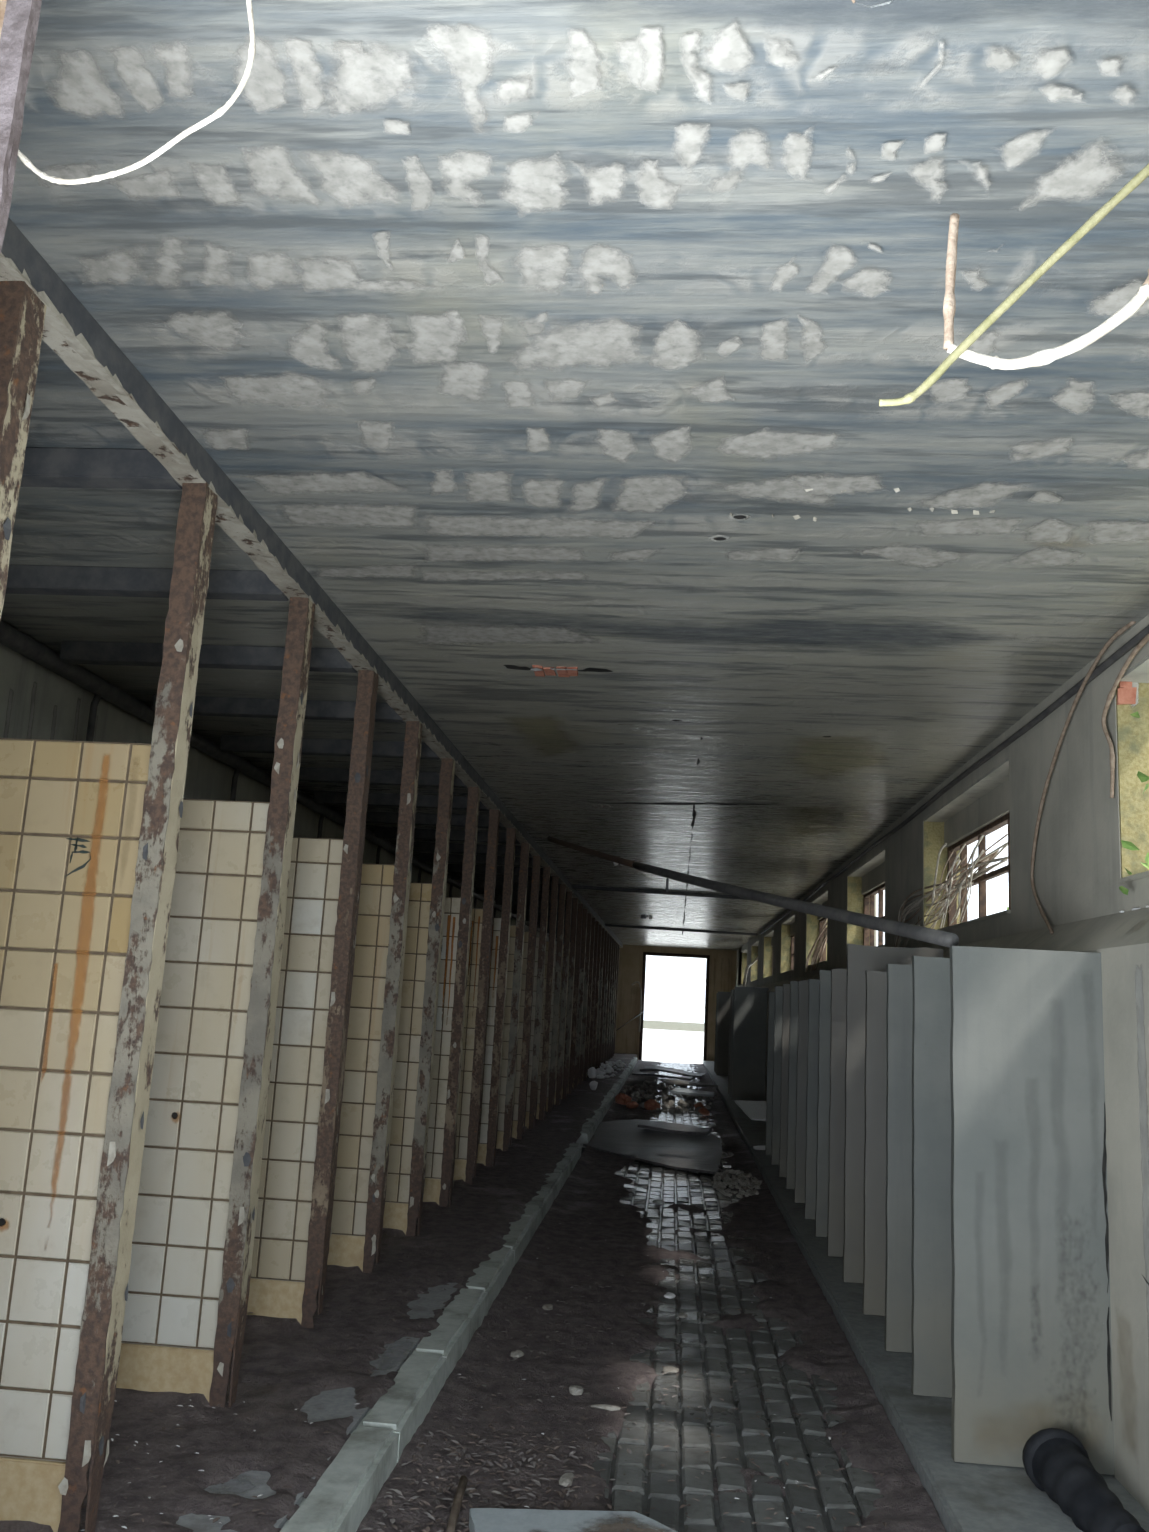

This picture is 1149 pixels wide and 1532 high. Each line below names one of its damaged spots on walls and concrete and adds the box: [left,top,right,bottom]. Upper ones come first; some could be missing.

peeling [235,37,411,113]
peeling [246,145,490,210]
peeling [501,155,679,213]
rust [22,393,30,420]
peeling [224,311,741,408]
peeling [0,256,466,773]
peeling [251,427,690,581]
rust [274,738,299,774]
rust [42,964,58,1078]
rust [53,756,108,1192]
rust [432,911,499,1018]
rust [238,1206,255,1226]